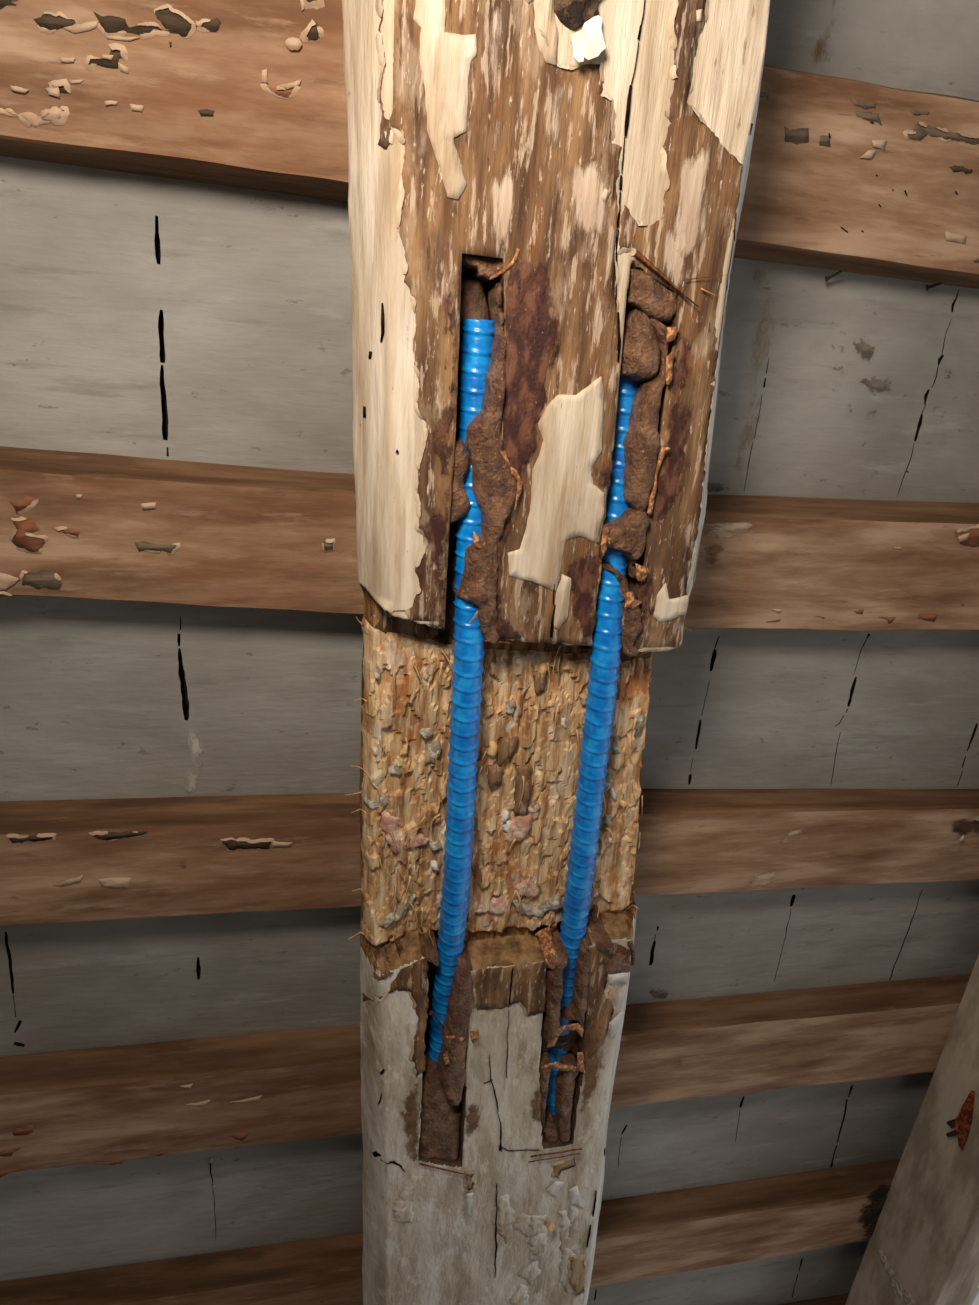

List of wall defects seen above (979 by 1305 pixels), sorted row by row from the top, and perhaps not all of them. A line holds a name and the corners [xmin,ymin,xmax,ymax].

peeling [0,4,221,127]
peeling [299,0,325,43]
peeling [784,127,831,147]
peeling [903,108,979,146]
crack [153,216,161,264]
crack [158,310,169,456]
crack [897,290,959,497]
peeling [9,496,80,554]
peeling [347,0,751,1078]
crack [688,637,719,785]
crack [831,633,871,783]
peeling [490,1156,587,1305]